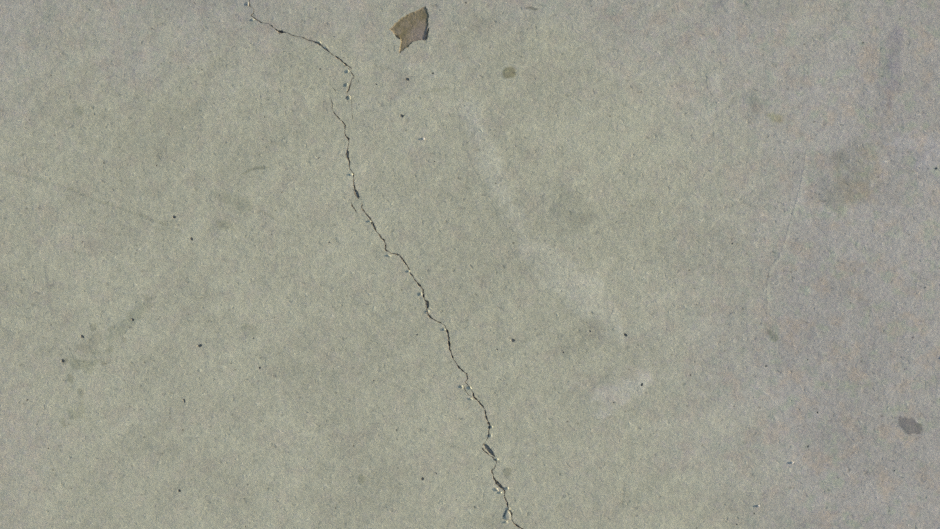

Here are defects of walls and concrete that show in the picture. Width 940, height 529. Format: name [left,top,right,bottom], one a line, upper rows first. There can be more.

crack [247,0,523,529]